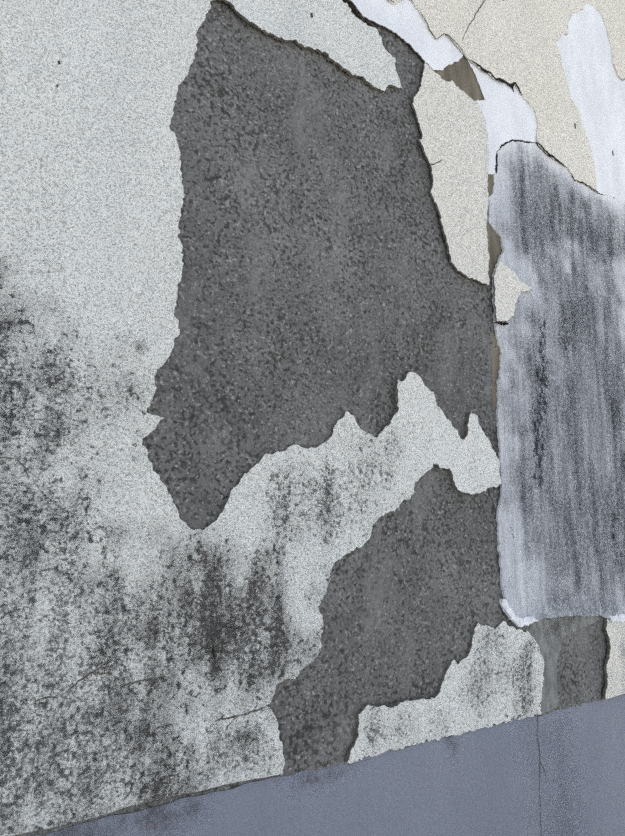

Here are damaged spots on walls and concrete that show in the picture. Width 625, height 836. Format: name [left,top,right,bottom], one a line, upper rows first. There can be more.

crack [390,0,522,95]
damp [515,151,625,254]
spalling [142,0,625,777]
damp [530,269,625,613]
damp [0,308,402,835]
damp [364,707,413,755]
damp [454,625,540,726]
crack [537,711,547,836]